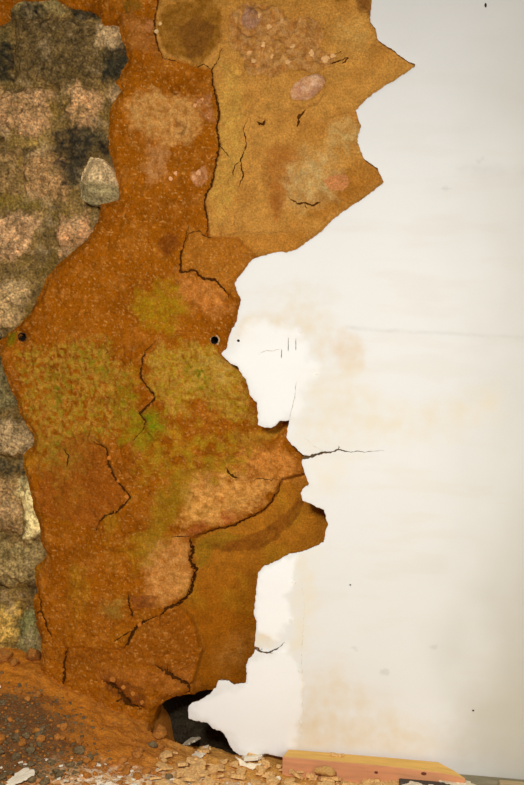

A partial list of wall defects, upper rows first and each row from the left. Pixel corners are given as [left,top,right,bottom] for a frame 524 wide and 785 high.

flaking render [227,0,336,100]
flaking render [190,165,208,187]
crack [179,48,265,300]
crack [132,340,156,441]
peeling [225,316,324,427]
flaking render [34,432,129,529]
crack [93,441,131,531]
crack [303,438,383,459]
crack [115,469,283,648]
flaking render [99,671,148,710]
crack [156,665,191,692]
peeling [190,554,307,770]